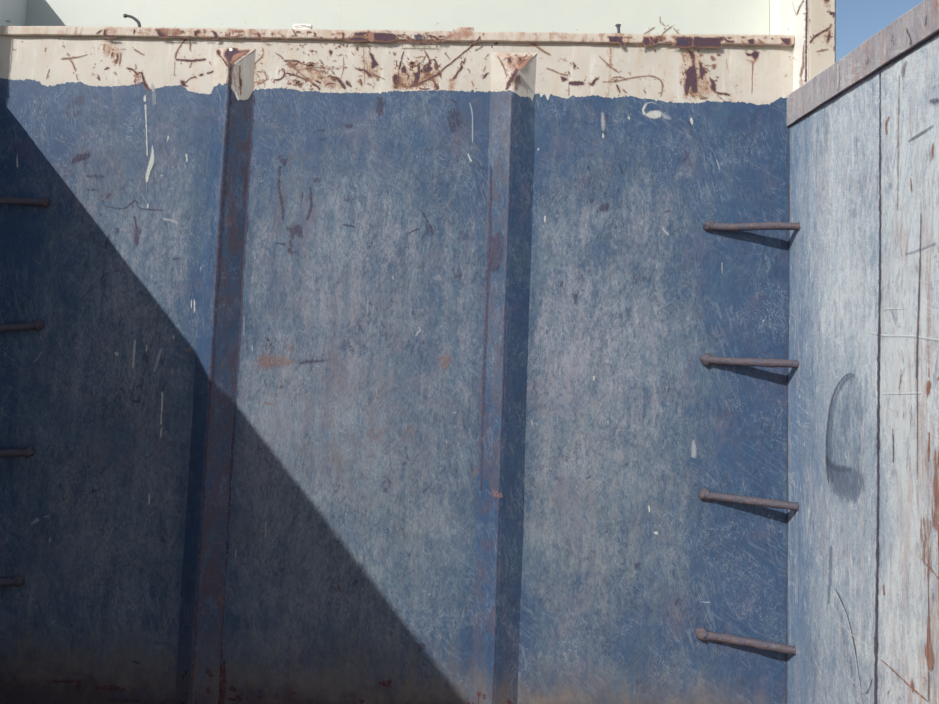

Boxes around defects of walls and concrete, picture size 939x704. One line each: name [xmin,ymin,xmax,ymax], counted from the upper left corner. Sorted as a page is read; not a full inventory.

spalling [216,48,251,66]
spalling [389,50,442,91]
spalling [497,54,532,90]
peeling [561,59,599,86]
rust [608,0,810,90]
rust [133,24,484,704]
rust [467,95,512,704]
rust [920,432,939,686]